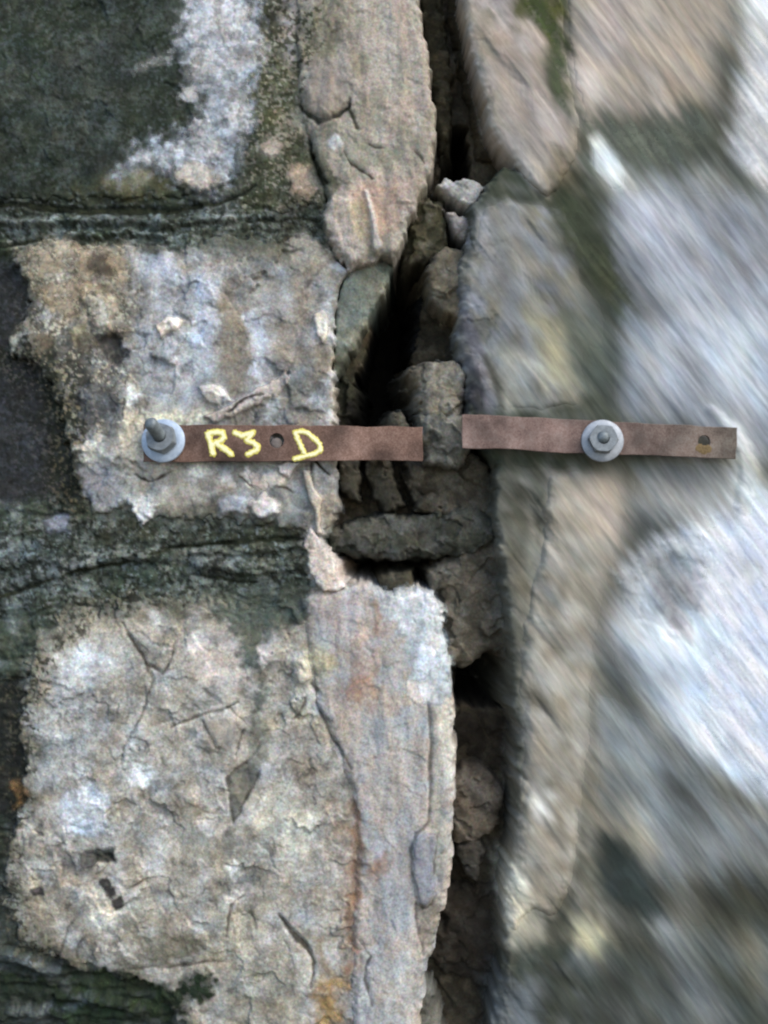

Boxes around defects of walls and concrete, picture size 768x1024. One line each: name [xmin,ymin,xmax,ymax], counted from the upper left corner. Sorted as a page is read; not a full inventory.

efflorescence [112,0,265,193]
crack [301,100,382,184]
crack [415,0,519,203]
crack [338,301,454,427]
leakage [127,496,158,523]
crack [136,474,165,482]
crack [280,461,413,525]
crack [450,665,506,904]
crack [422,945,493,1024]